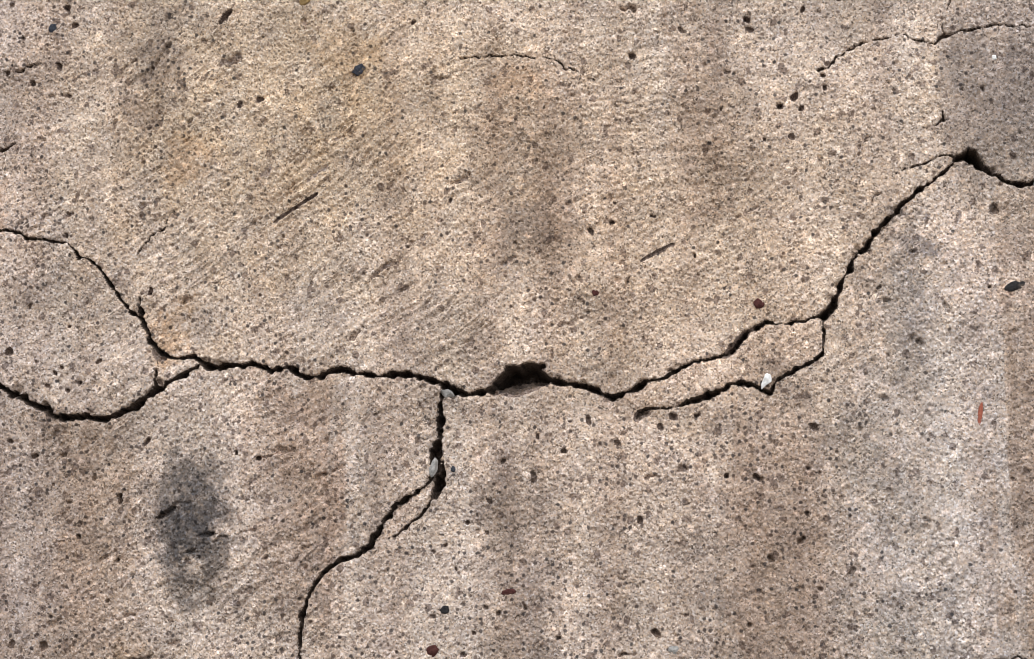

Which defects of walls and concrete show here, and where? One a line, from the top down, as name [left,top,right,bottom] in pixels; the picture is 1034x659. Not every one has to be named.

crack [816,0,1028,72]
crack [137,211,175,254]
crack [552,154,1034,414]
crack [0,229,495,659]
water stain [158,466,225,587]